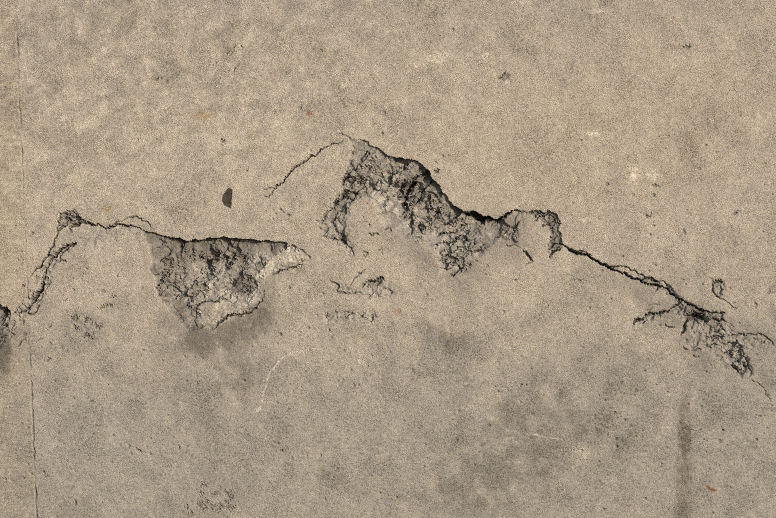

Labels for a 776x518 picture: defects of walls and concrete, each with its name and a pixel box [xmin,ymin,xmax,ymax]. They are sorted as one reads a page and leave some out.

crack [263,133,351,198]
spalling [315,138,565,283]
spalling [0,304,11,343]
crack [13,216,154,316]
spalling [140,229,311,334]
crack [562,244,726,326]
spalling [664,304,776,402]